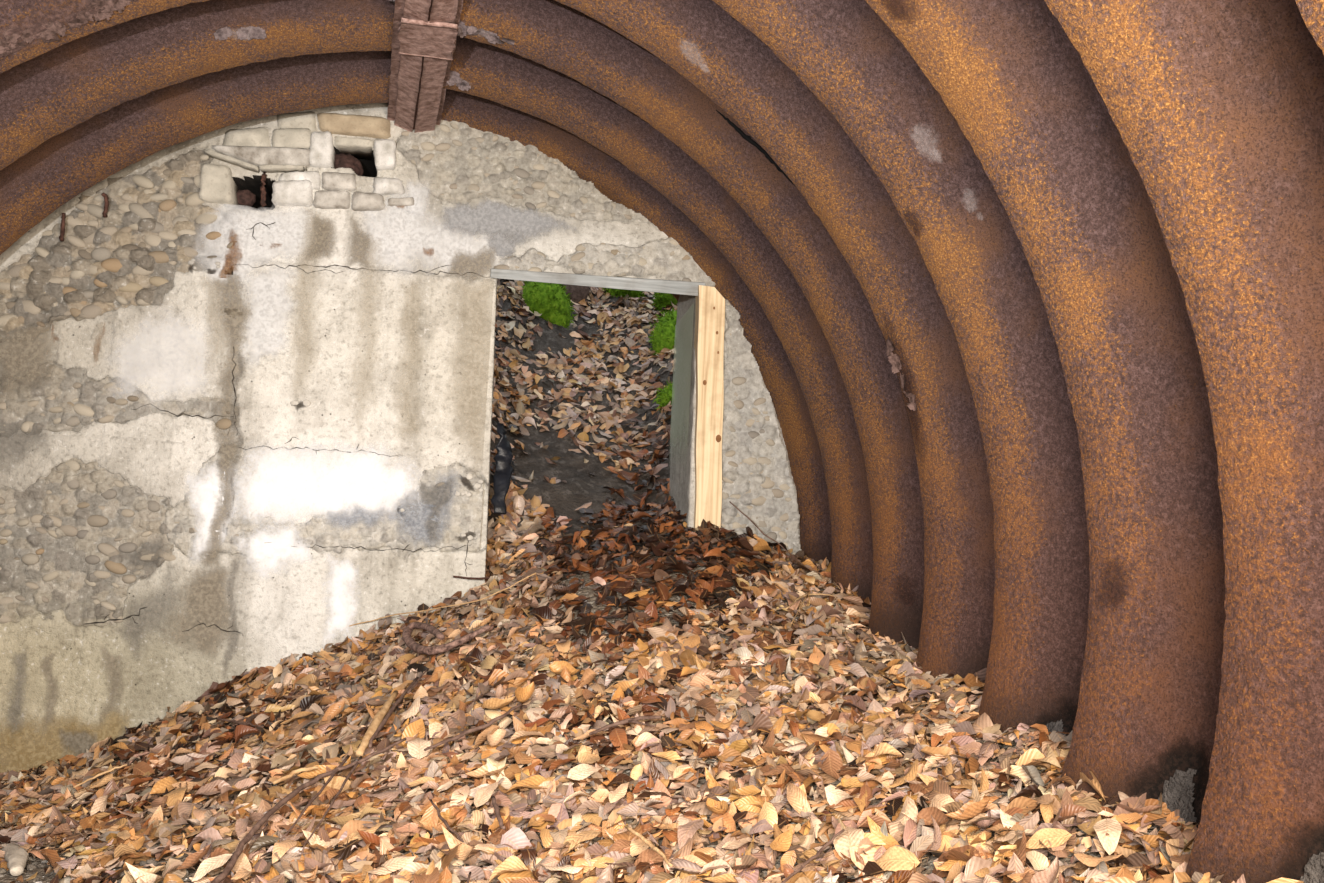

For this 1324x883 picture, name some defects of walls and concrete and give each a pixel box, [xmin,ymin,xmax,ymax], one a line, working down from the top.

rust [0,0,136,58]
rust [214,26,267,41]
rust [457,20,515,45]
rust [447,70,471,91]
rust [221,232,241,278]
damp [351,186,495,442]
rust [886,337,917,411]
damp [173,204,454,652]
damp [0,651,127,773]